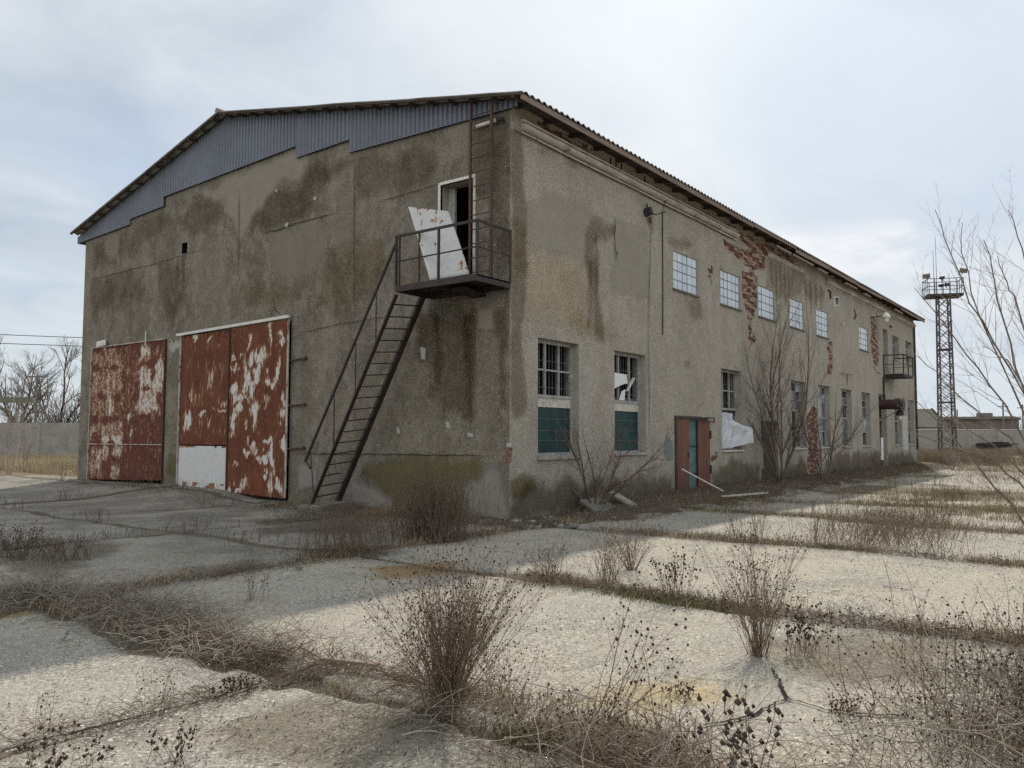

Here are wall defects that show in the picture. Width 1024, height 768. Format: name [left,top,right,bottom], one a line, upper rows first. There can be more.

flaking render [723,223,794,344]
flaking render [870,315,879,368]
flaking render [806,406,820,474]